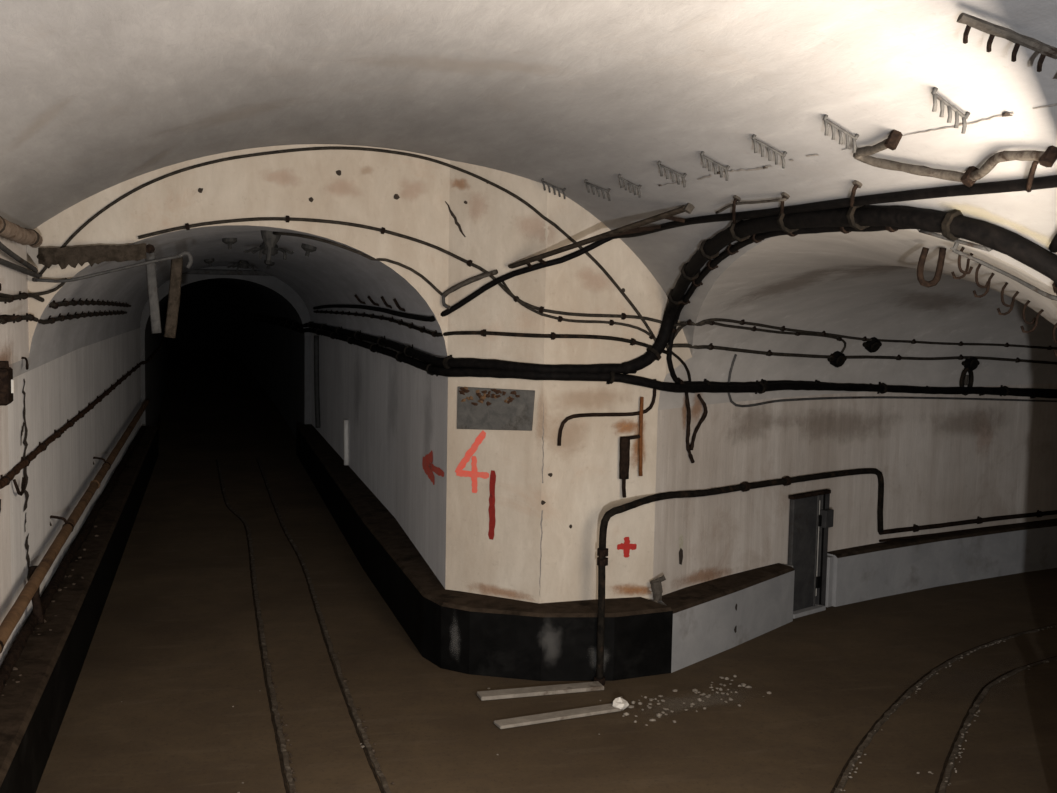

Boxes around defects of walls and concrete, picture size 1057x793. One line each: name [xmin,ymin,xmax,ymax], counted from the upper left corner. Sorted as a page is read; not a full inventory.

rust [617,423,643,461]